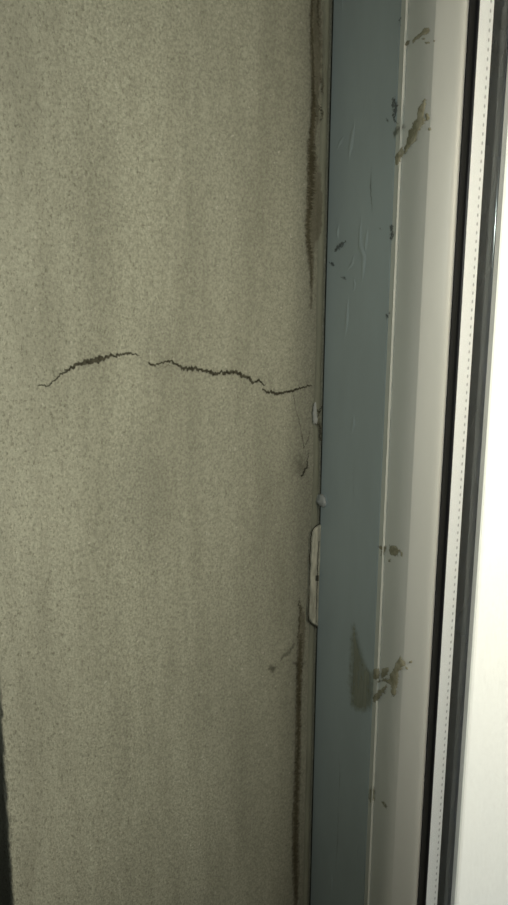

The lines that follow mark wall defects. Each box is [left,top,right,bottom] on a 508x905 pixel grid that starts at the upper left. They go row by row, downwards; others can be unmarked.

leakage [305,0,324,308]
crack [38,352,312,396]
leakage [282,603,305,905]